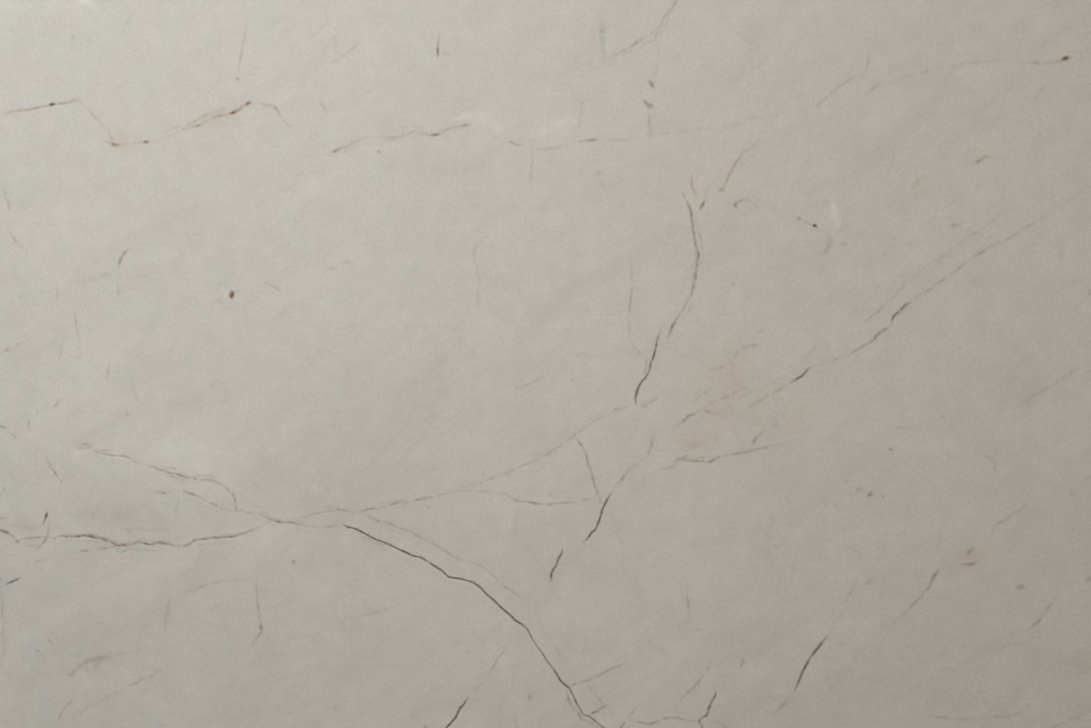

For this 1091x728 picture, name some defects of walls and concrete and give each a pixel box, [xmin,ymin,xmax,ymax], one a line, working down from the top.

crack [347,526,531,636]